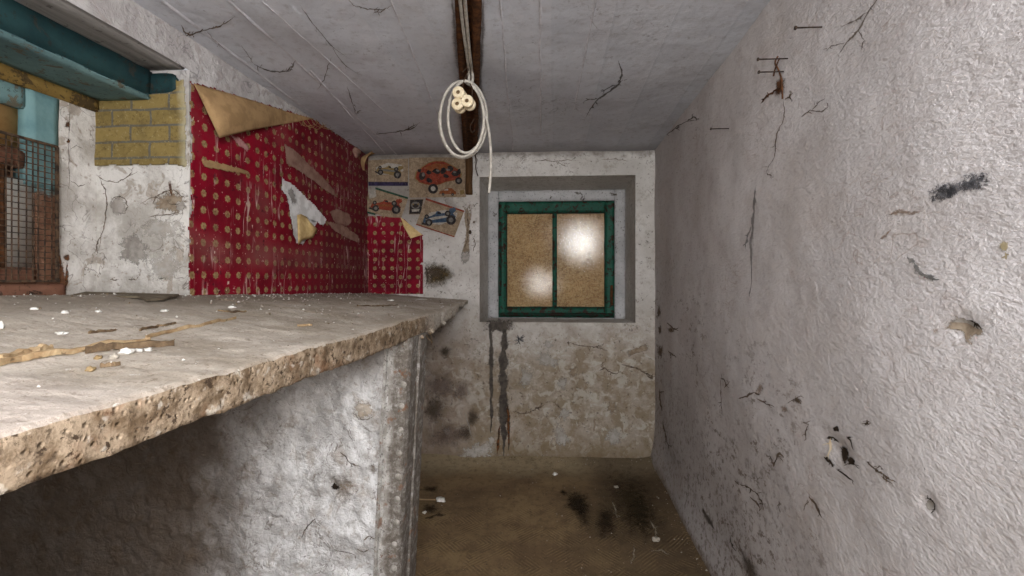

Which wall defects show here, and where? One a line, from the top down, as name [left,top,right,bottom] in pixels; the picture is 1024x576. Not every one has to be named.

crack [823,0,877,57]
peeling [194,84,313,138]
crack [583,61,627,113]
crack [67,114,137,255]
peeling [110,182,187,281]
flaking render [281,177,326,245]
crack [743,91,828,294]
water stain [425,265,451,286]
spalling [934,315,983,344]
water stain [486,319,513,456]
water stain [561,476,668,555]